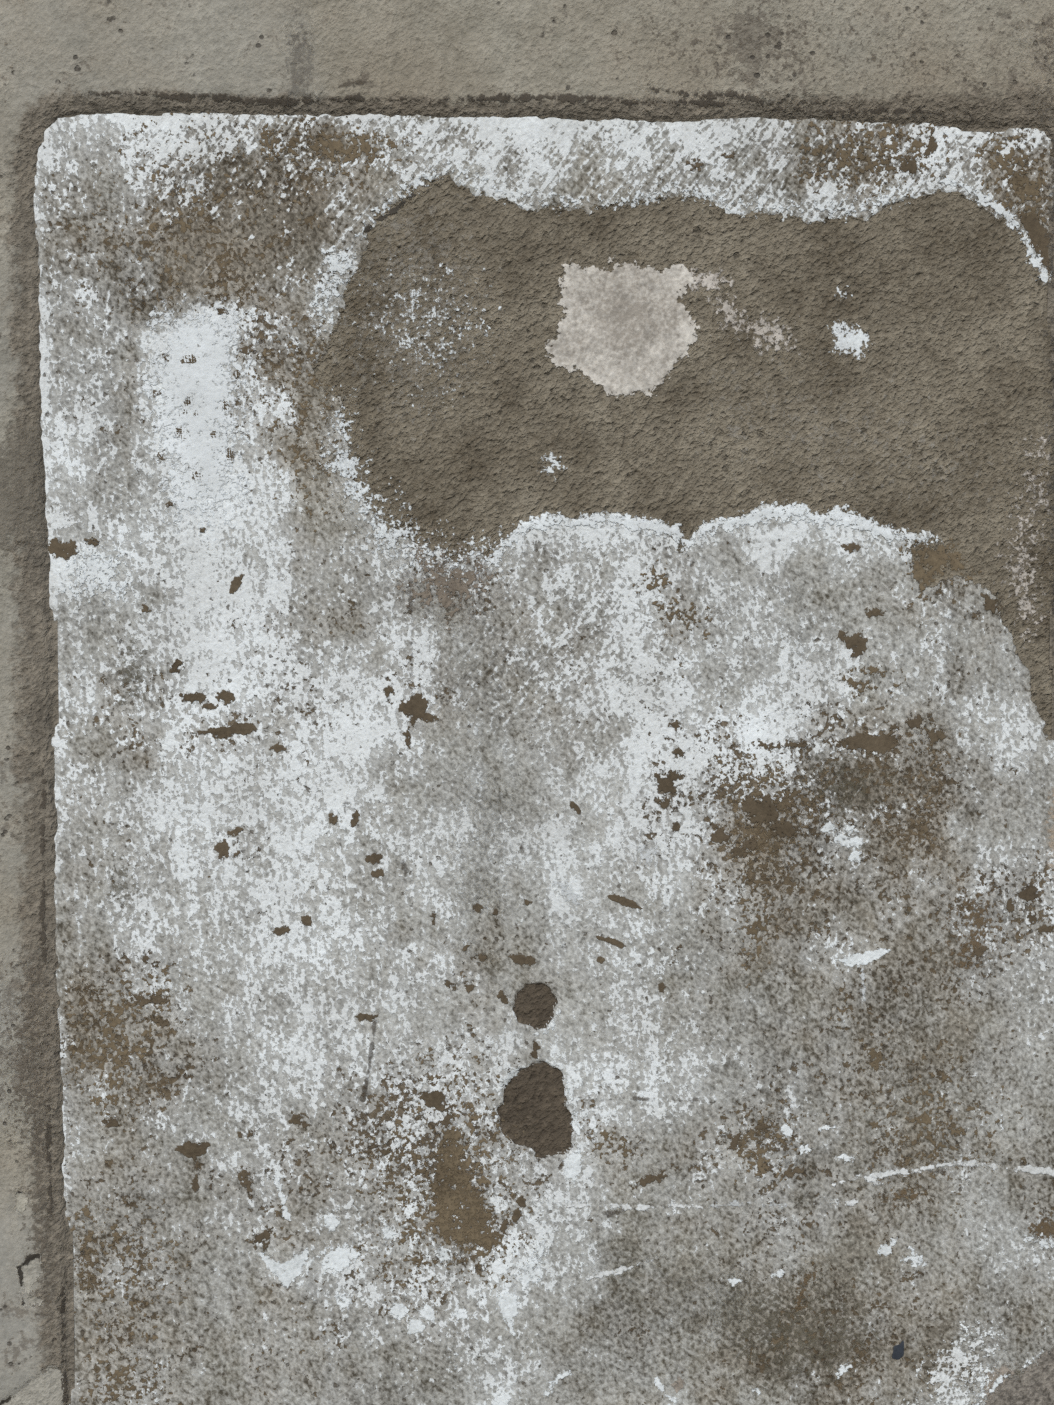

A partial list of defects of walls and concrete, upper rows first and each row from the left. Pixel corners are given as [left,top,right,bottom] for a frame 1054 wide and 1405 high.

peeling [126,293,262,539]
flaking render [305,119,1054,746]
peeling [48,537,152,613]
peeling [229,574,245,594]
peeling [508,953,536,966]
peeling [444,980,476,994]
spalling [496,983,590,1181]
peeling [436,1246,453,1263]
peeling [388,1303,468,1335]